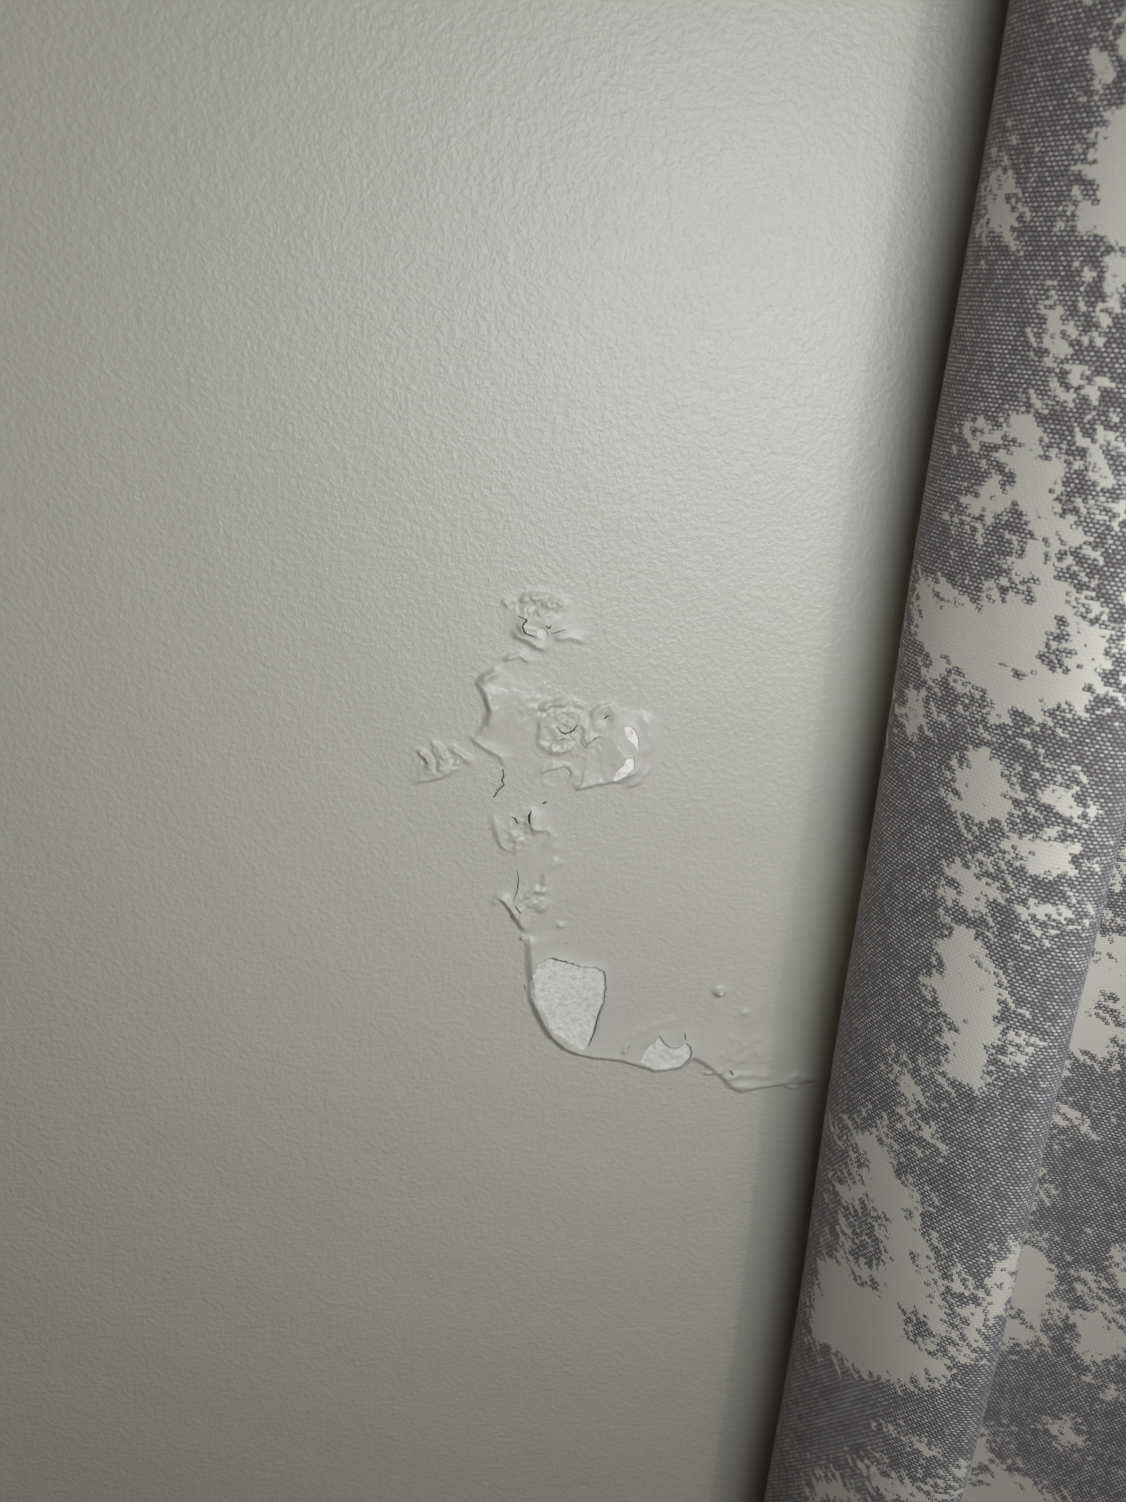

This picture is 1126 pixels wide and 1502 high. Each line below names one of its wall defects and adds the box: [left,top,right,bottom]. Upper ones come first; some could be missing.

peeling [517,941,704,1075]